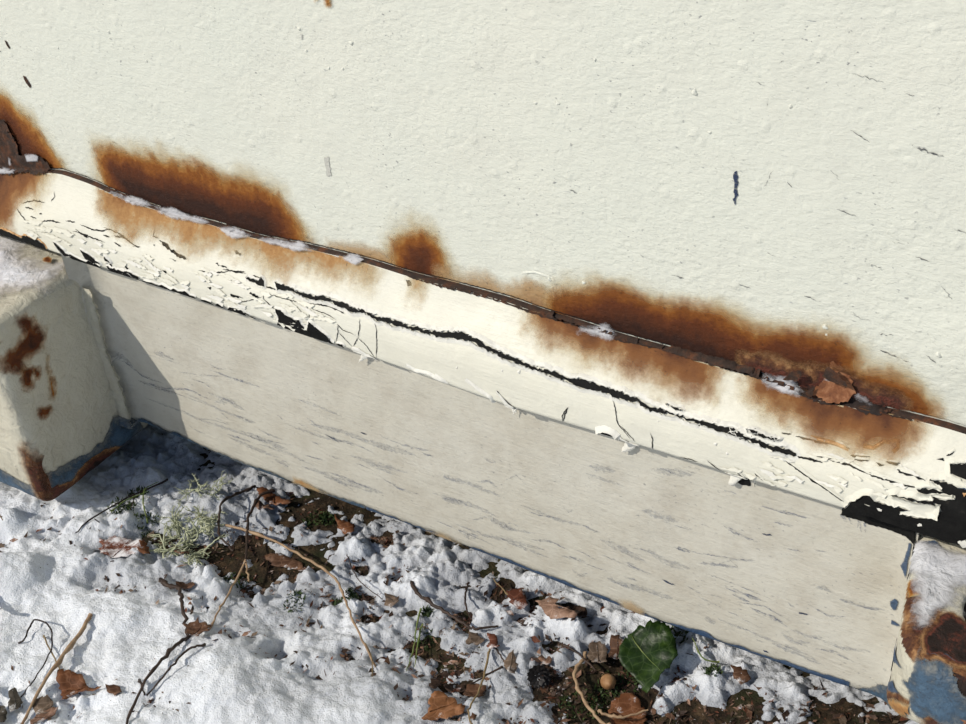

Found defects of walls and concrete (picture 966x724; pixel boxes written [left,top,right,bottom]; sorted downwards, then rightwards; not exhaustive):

rust [0,94,62,229]
crack [17,195,157,248]
peeling [0,220,377,363]
rust [94,147,934,453]
rust [1,316,56,419]
crack [198,269,955,501]
peeling [720,435,966,555]
peeling [887,639,901,694]
rust [887,676,909,719]
rust [900,580,966,697]